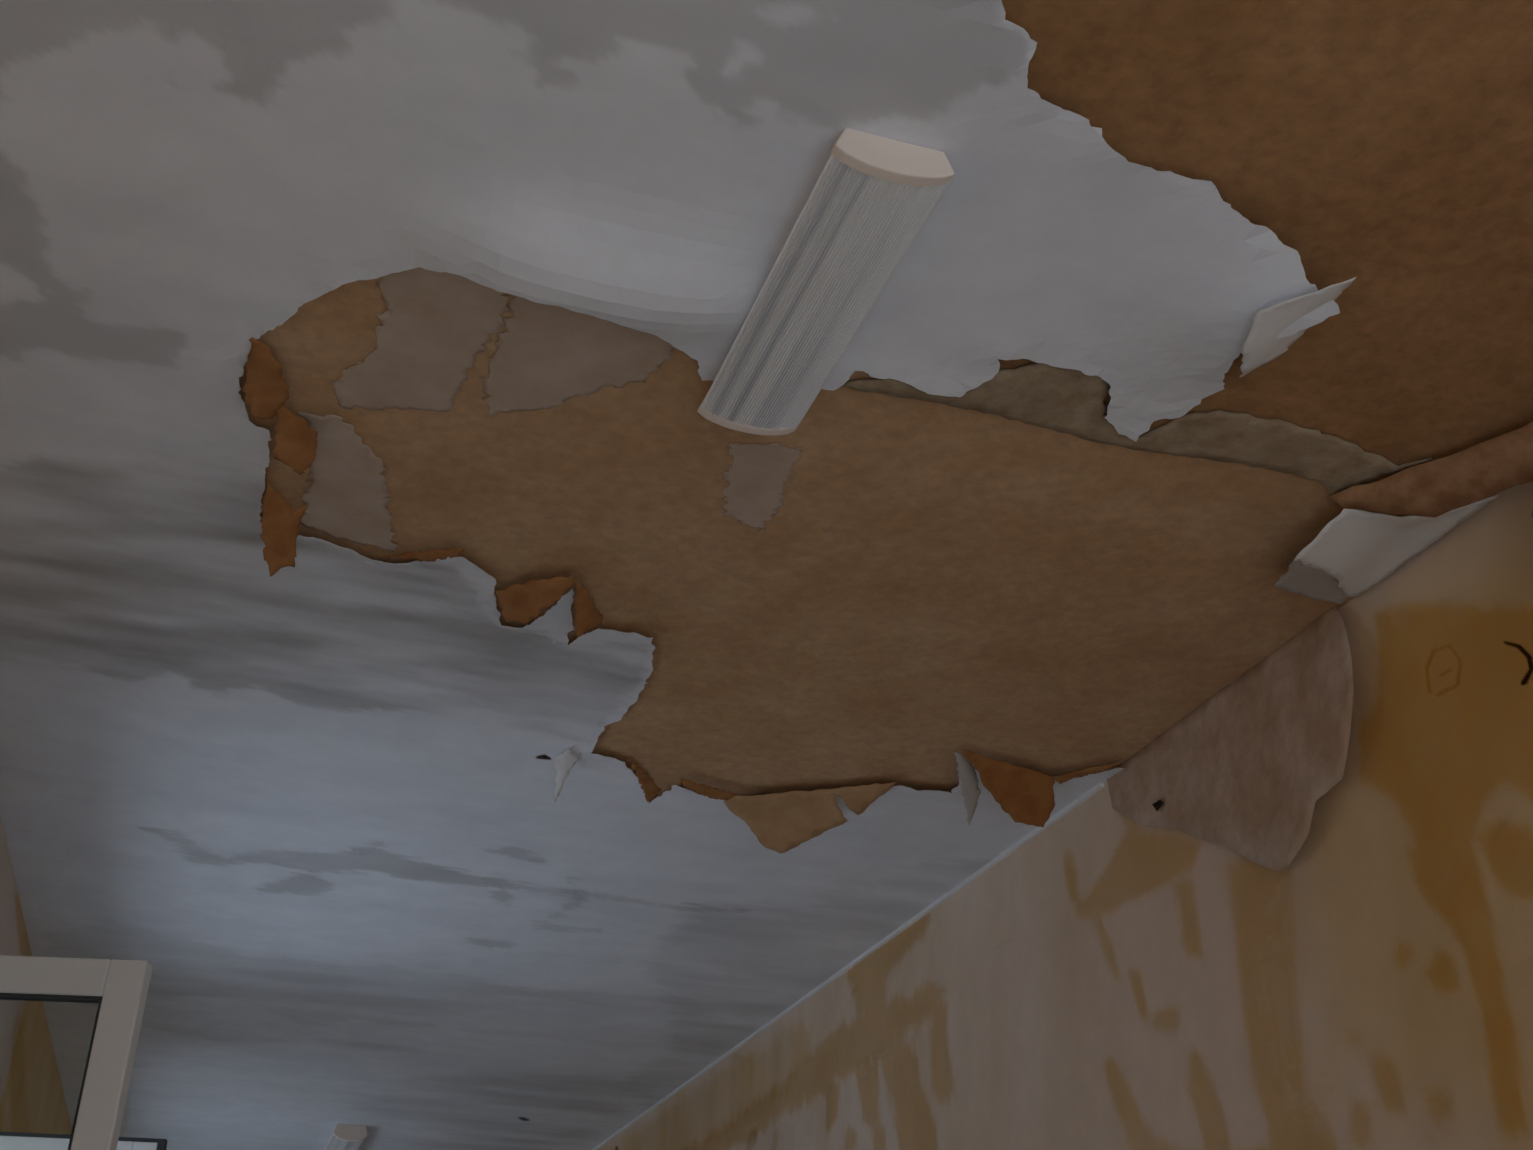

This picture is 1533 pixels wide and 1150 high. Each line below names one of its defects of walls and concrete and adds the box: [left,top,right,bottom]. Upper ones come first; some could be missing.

peeling [238,0,1533,871]